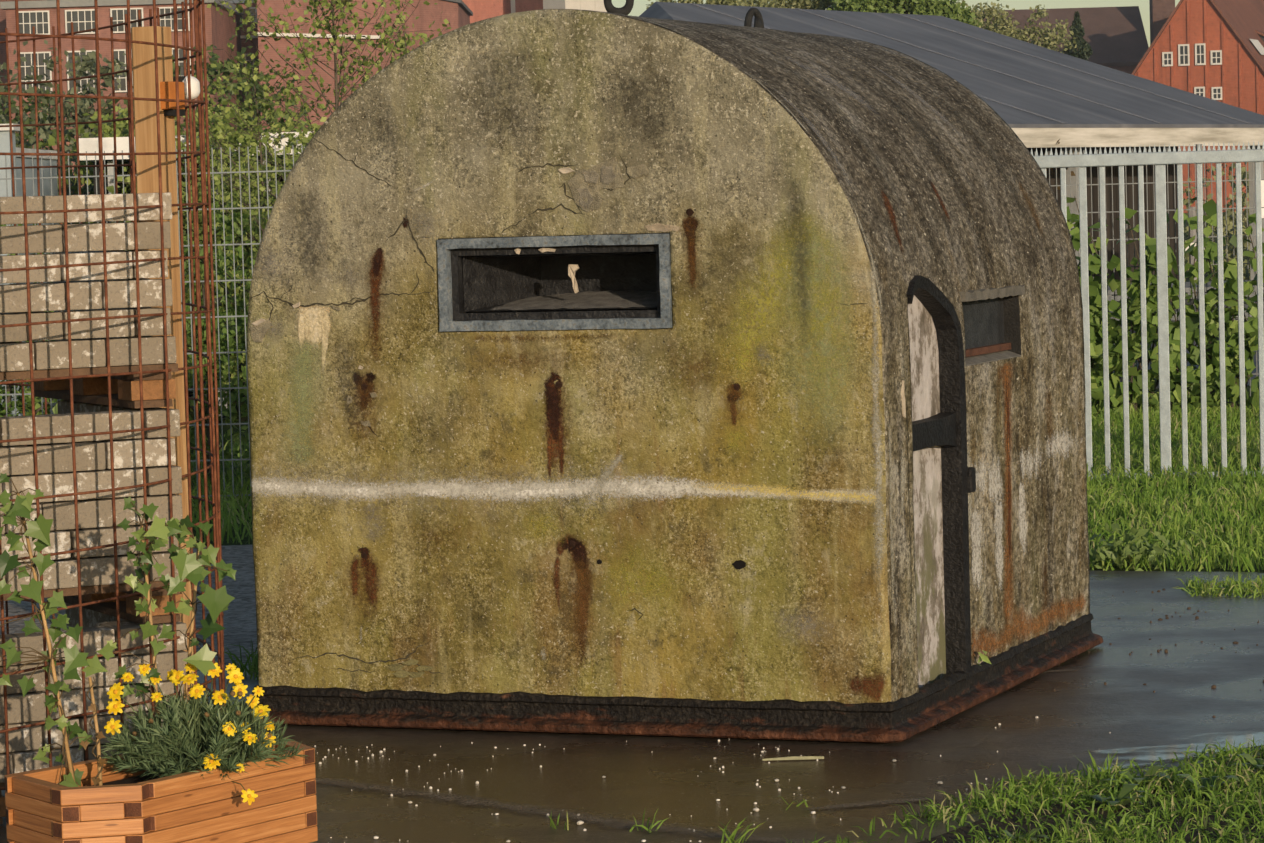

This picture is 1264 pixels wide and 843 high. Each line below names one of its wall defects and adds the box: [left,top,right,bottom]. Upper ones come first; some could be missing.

crack [243,132,434,320]
spalling [500,156,650,235]
rust [683,208,698,283]
rust [370,222,404,355]
rust [347,365,377,437]
rust [545,372,566,475]
rust [727,383,742,425]
rust [972,363,1085,661]
rust [351,547,377,608]
rust [554,534,591,661]
rust [850,677,885,702]